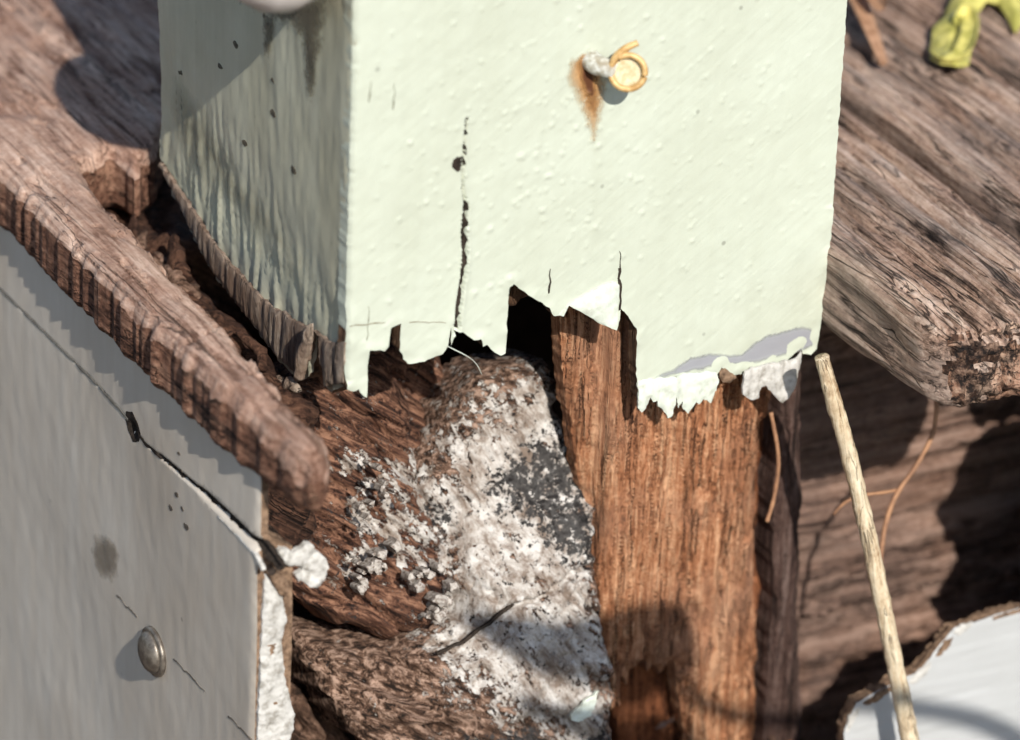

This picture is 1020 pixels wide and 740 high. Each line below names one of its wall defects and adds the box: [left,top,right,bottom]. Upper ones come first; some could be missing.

corrosion [570,57,603,131]
crack [452,118,469,328]
peeling [558,281,619,330]
peeling [636,351,802,418]
crack [0,288,288,571]
peeling [908,621,973,685]
peeling [845,686,891,732]